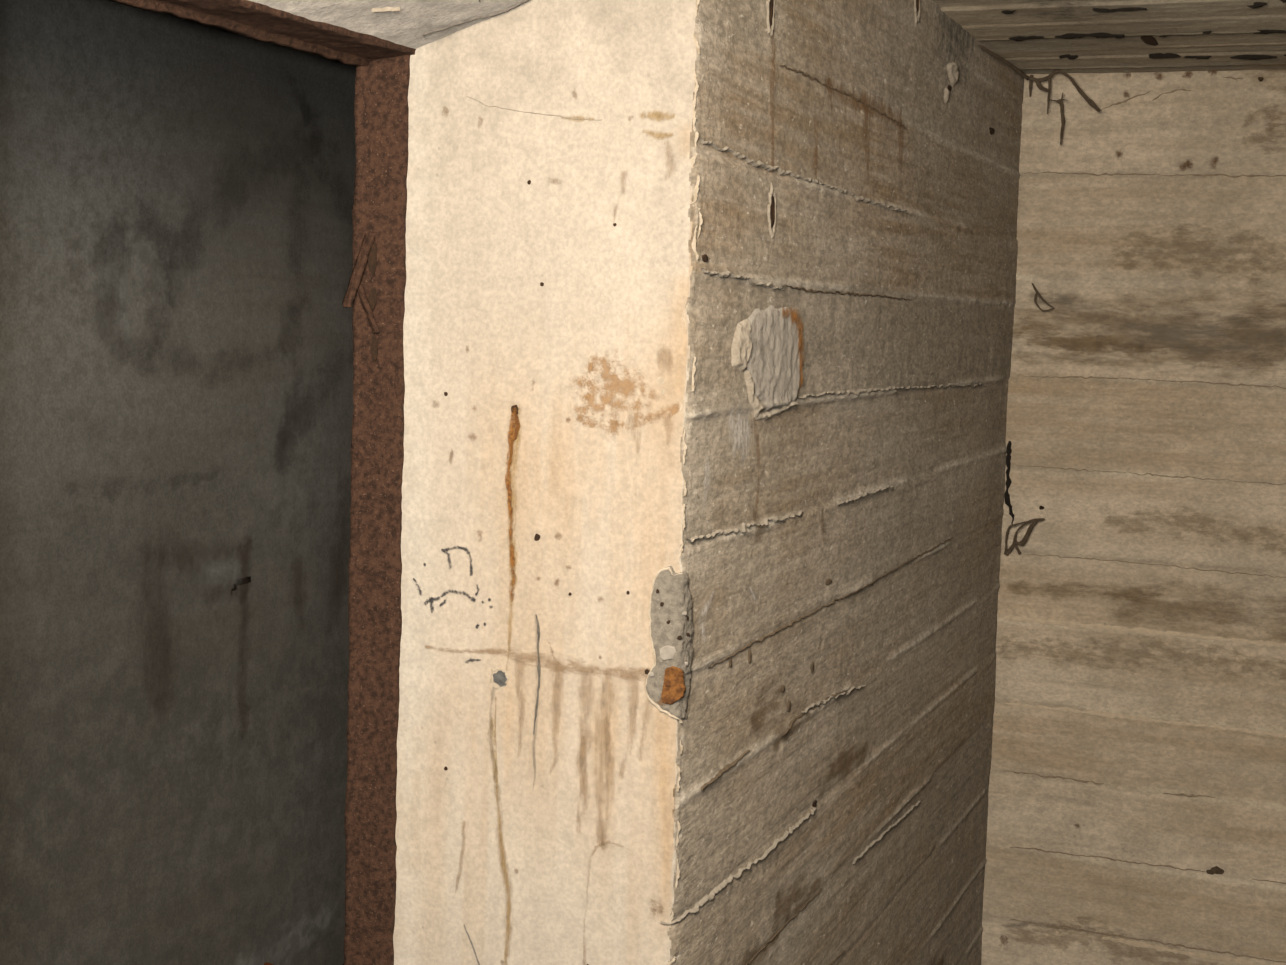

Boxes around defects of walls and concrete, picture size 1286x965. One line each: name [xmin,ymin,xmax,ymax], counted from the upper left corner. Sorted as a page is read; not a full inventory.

spalling [690,33,703,262]
spalling [731,305,803,421]
rust [505,405,520,598]
spalling [645,357,697,723]
crack [1004,441,1286,525]